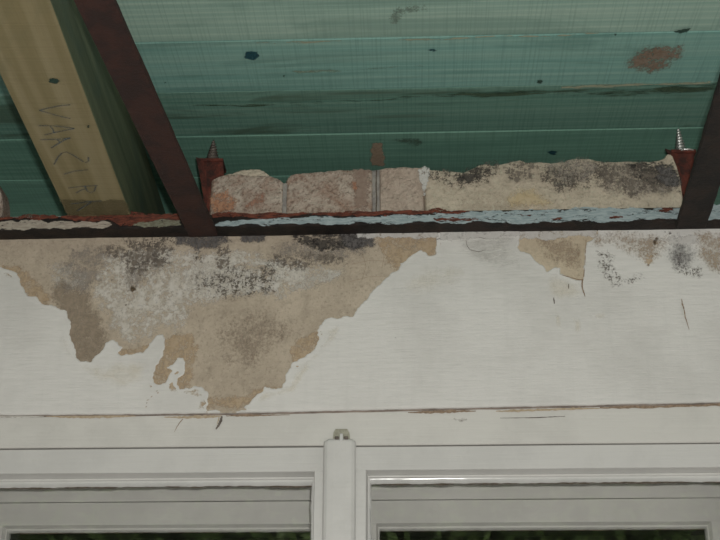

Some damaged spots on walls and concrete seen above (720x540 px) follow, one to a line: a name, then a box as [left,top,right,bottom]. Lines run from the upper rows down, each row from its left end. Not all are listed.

corrosion [628,45,682,74]
leakage [429,158,682,198]
leakage [106,231,520,298]
peeling [518,230,598,280]
leakage [619,234,720,276]
peeling [0,233,437,430]